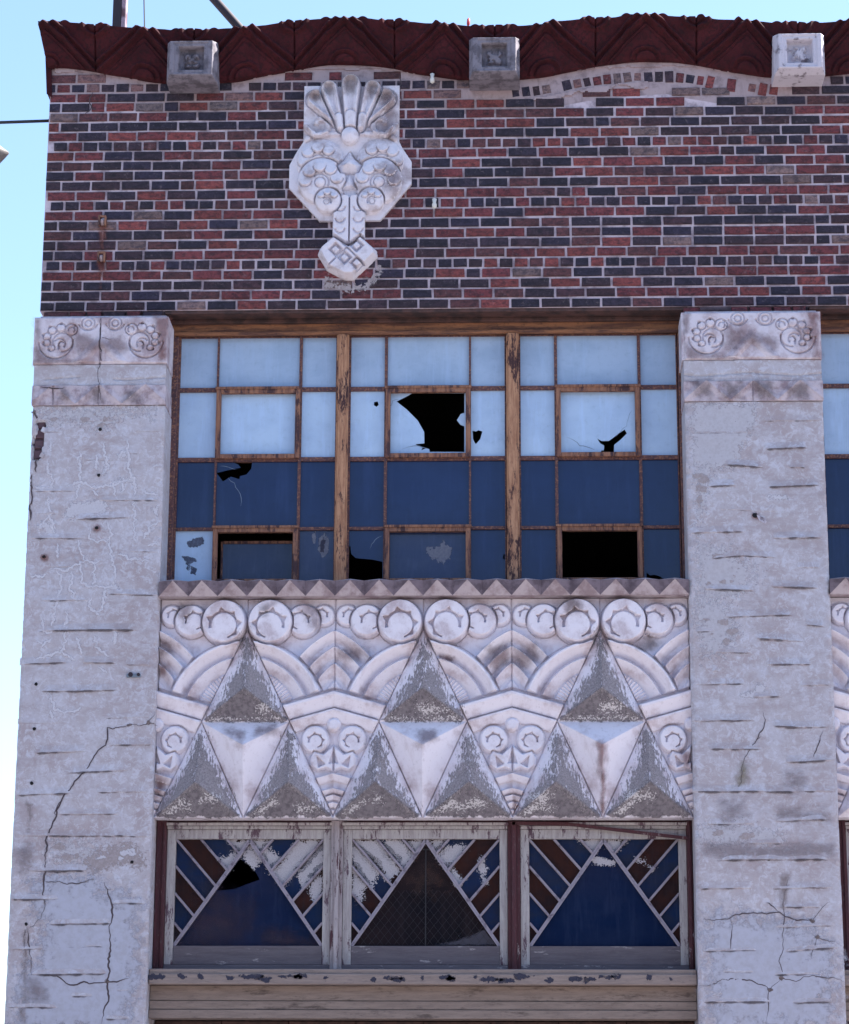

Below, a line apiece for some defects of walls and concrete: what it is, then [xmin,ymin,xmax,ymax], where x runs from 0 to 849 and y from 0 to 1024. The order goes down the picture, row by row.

crack [97,319,114,397]
spalling [33,417,58,460]
peeling [156,632,693,820]
crack [738,712,766,787]
crack [24,720,157,1023]
peeling [226,973,307,983]
peeling [370,975,405,983]
peeling [473,973,554,983]
peeling [569,973,621,984]
crack [700,881,843,1015]